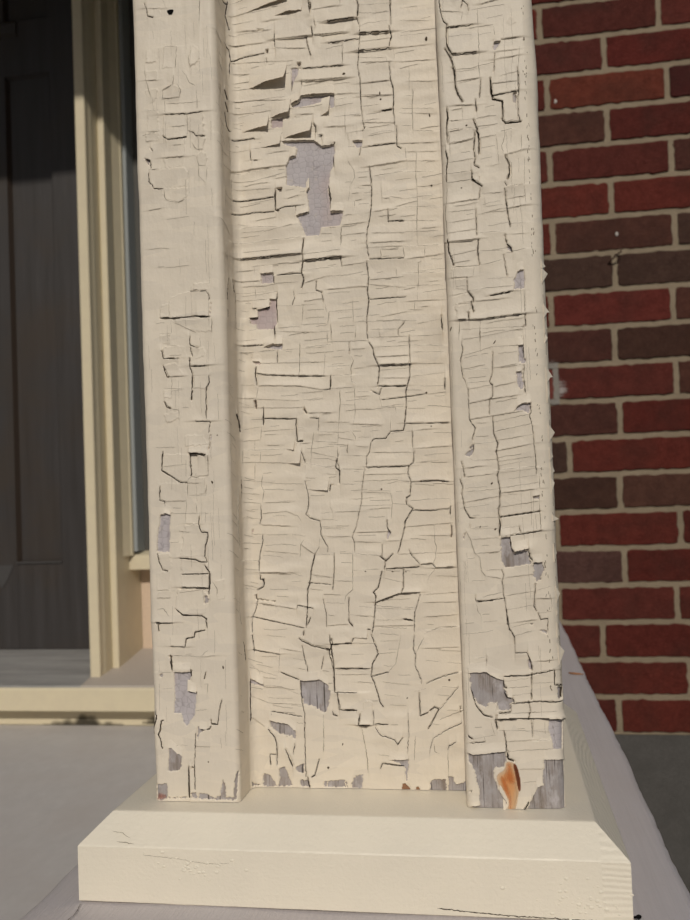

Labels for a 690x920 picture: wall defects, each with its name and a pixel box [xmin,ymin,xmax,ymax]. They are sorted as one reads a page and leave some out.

peeling [246,0,311,16]
peeling [242,62,343,236]
peeling [546,367,558,526]
peeling [157,503,171,552]
peeling [500,527,544,582]
peeling [176,559,209,614]
peeling [160,655,207,737]
peeling [299,671,330,712]
peeling [468,661,514,715]
corrosion [497,762,521,809]